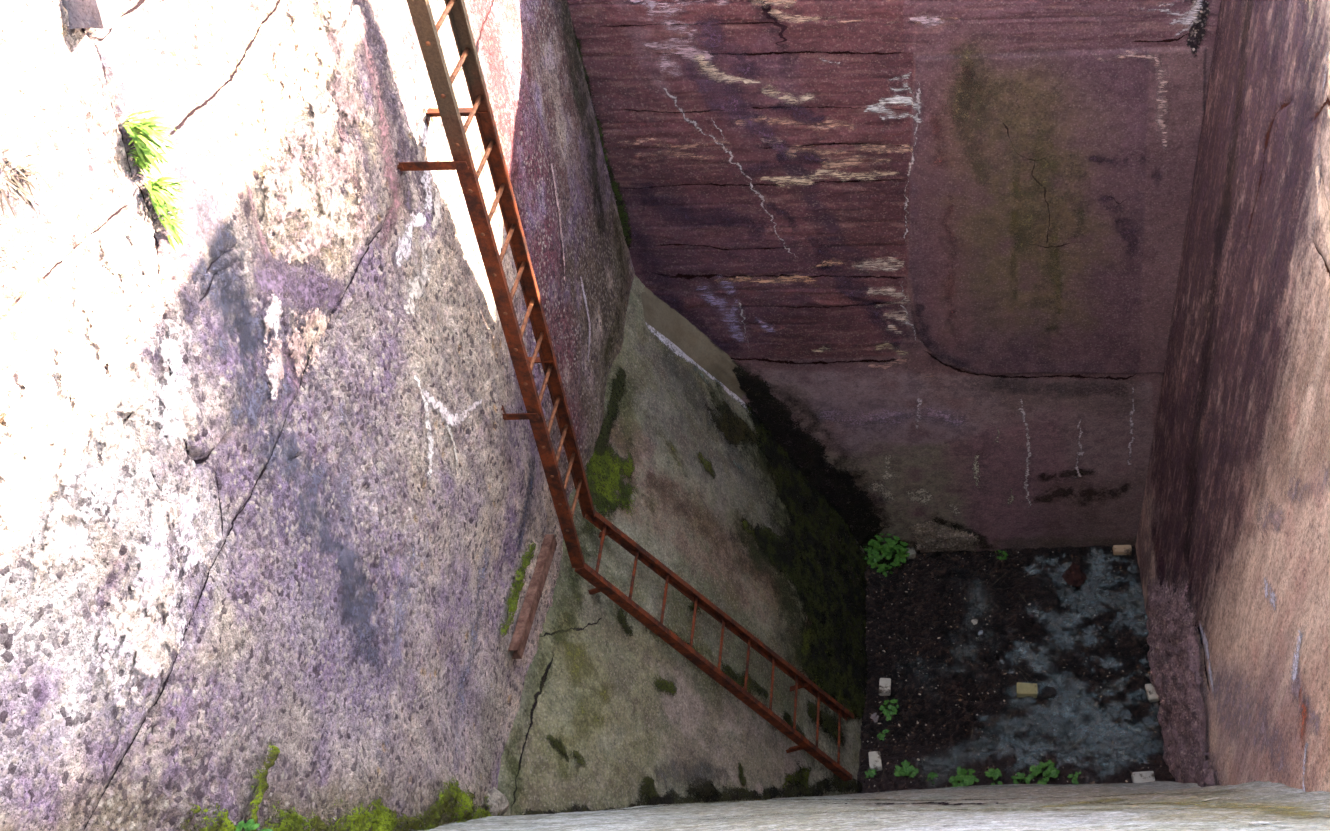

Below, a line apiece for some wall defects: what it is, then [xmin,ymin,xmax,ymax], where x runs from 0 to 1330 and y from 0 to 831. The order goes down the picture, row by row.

rust [480,0,523,226]
water stain [646,323,846,749]
crack [511,618,601,814]